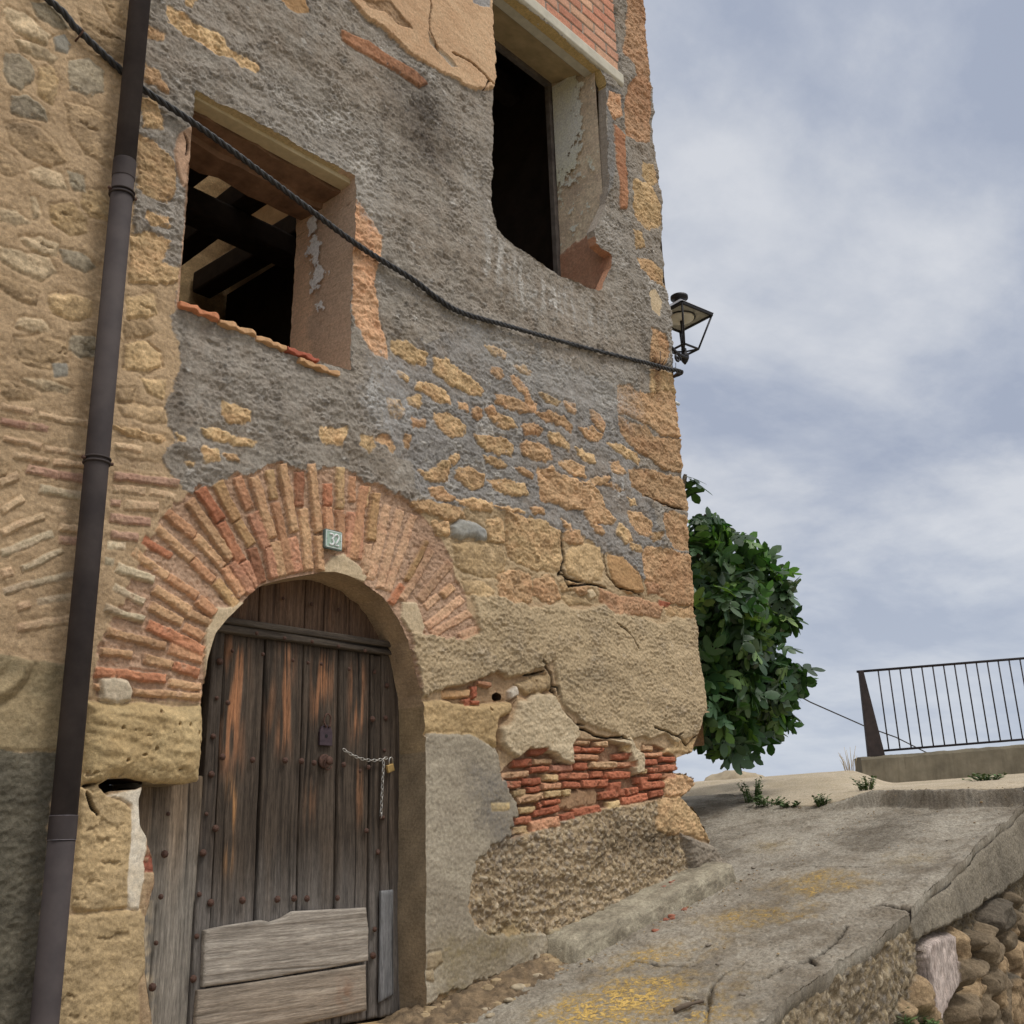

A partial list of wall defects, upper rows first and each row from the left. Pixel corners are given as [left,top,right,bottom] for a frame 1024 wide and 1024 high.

crack [428,0,495,92]
peeling [304,216,330,312]
spalling [319,0,696,619]
spalling [184,399,259,468]
crack [557,535,641,596]
crack [616,622,640,649]
crack [522,659,631,741]
crack [654,726,697,746]
flaking render [98,778,155,910]
spalling [441,670,724,937]